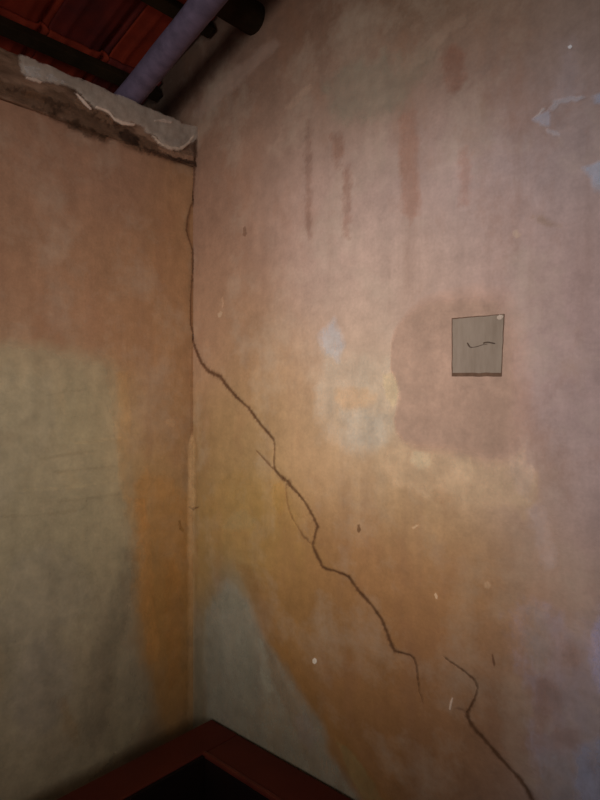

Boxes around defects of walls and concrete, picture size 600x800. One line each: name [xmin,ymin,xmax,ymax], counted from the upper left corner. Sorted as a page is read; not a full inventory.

flaking render [0,56,198,167]
crack [186,149,422,698]
crack [445,658,533,800]